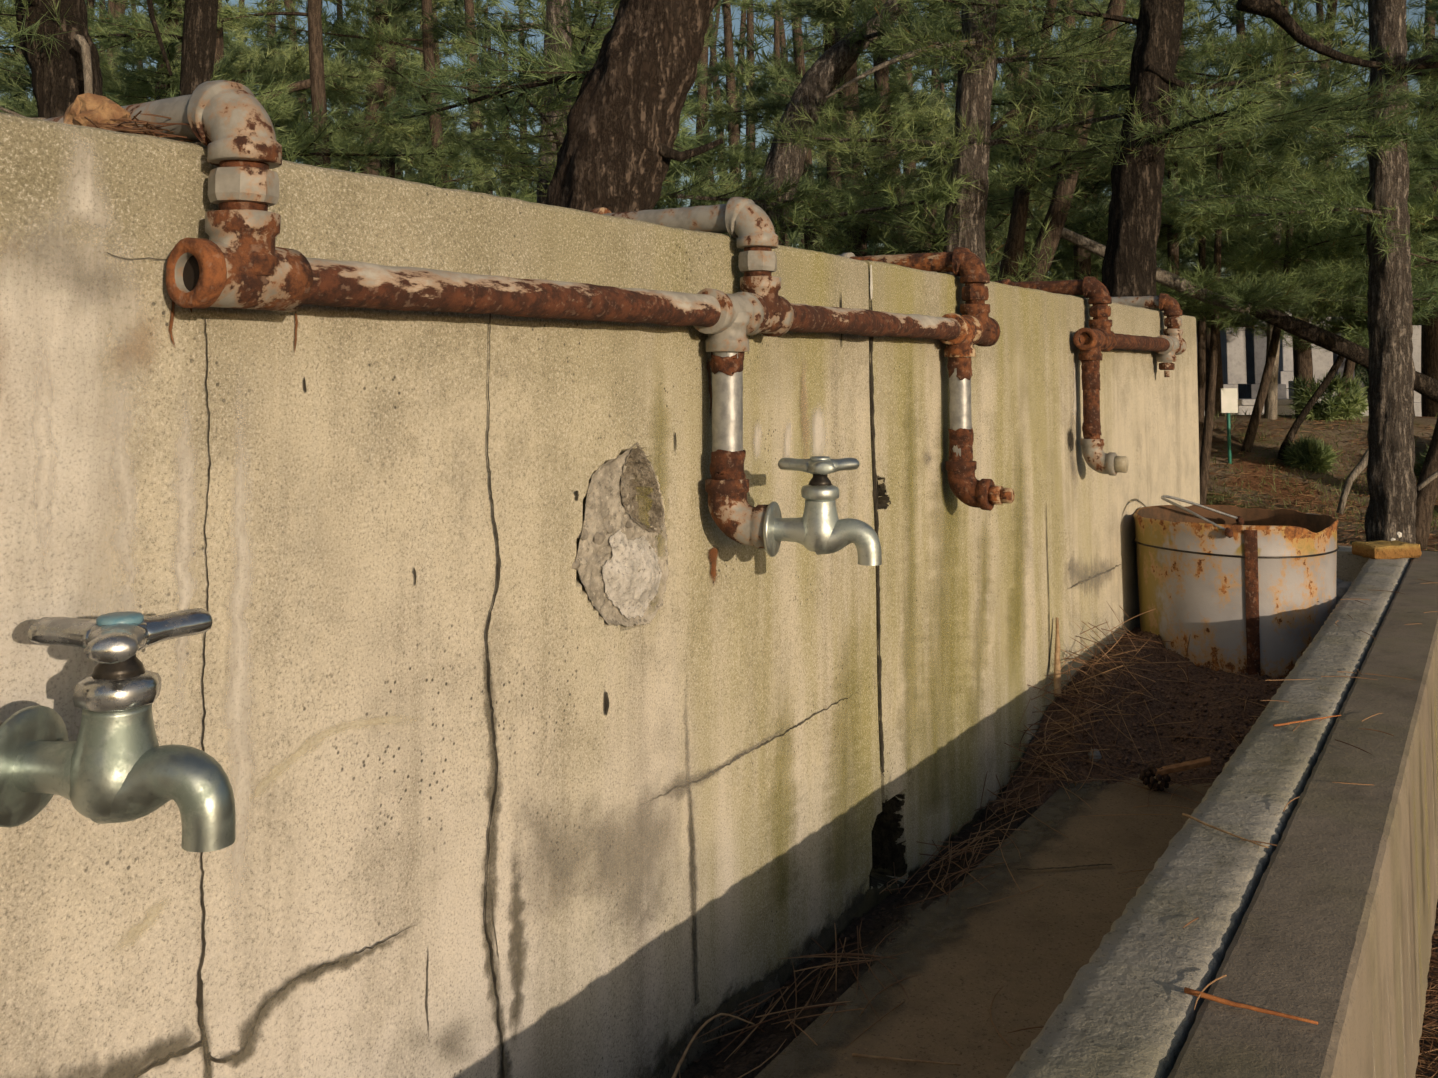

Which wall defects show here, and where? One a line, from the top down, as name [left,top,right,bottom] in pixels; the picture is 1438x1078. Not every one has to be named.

leakage [72,155,105,222]
leakage [0,242,135,737]
leakage [175,432,196,610]
crack [201,318,211,752]
leakage [227,458,251,872]
crack [485,314,505,1078]
spalling [571,442,669,627]
corrosion [709,547,718,582]
crack [658,295,885,797]
crack [139,852,240,1076]
crack [278,927,429,1034]